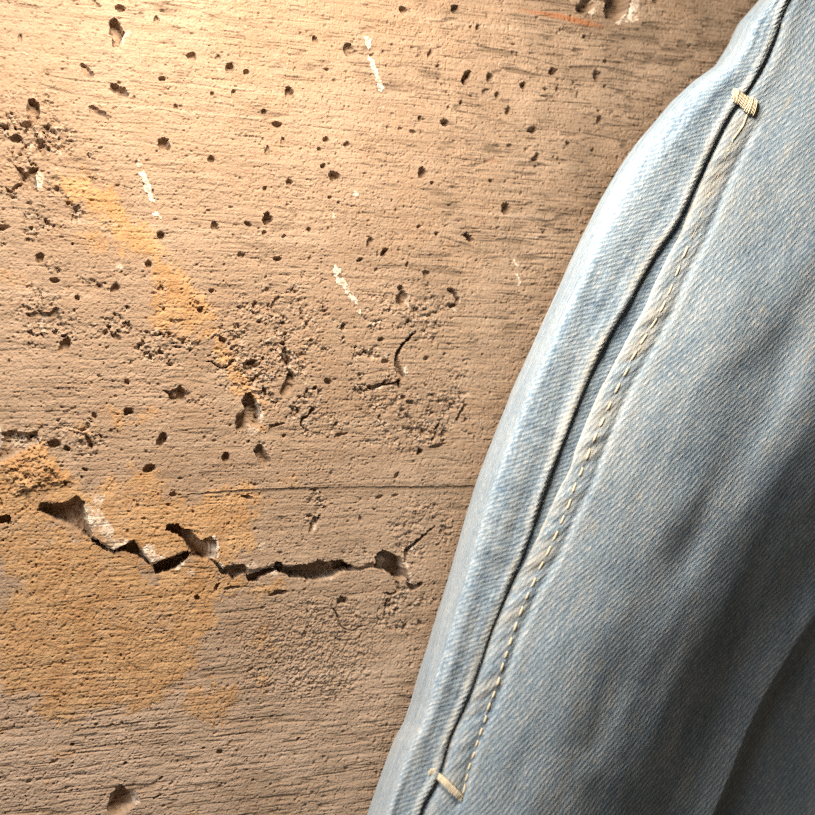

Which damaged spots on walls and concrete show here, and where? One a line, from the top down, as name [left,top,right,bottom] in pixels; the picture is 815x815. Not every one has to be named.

crack [367,330,417,391]
crack [37,495,436,617]
crack [331,608,363,632]